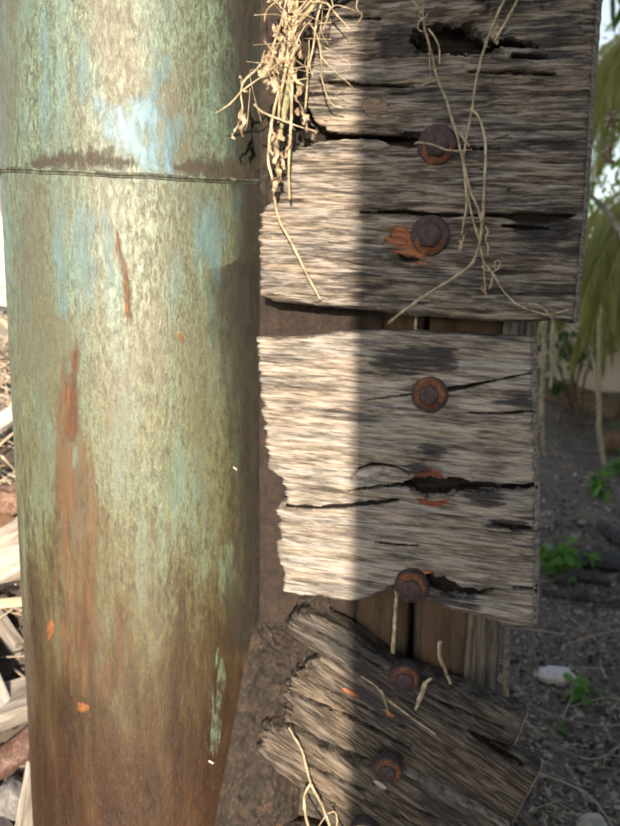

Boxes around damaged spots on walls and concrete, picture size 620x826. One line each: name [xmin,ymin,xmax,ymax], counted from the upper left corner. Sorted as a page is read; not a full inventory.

crack [468,54,556,76]
crack [362,210,574,231]
corrosion [384,226,444,264]
crack [448,372,531,391]
crack [470,408,533,416]
crack [358,462,409,474]
crack [285,498,398,509]